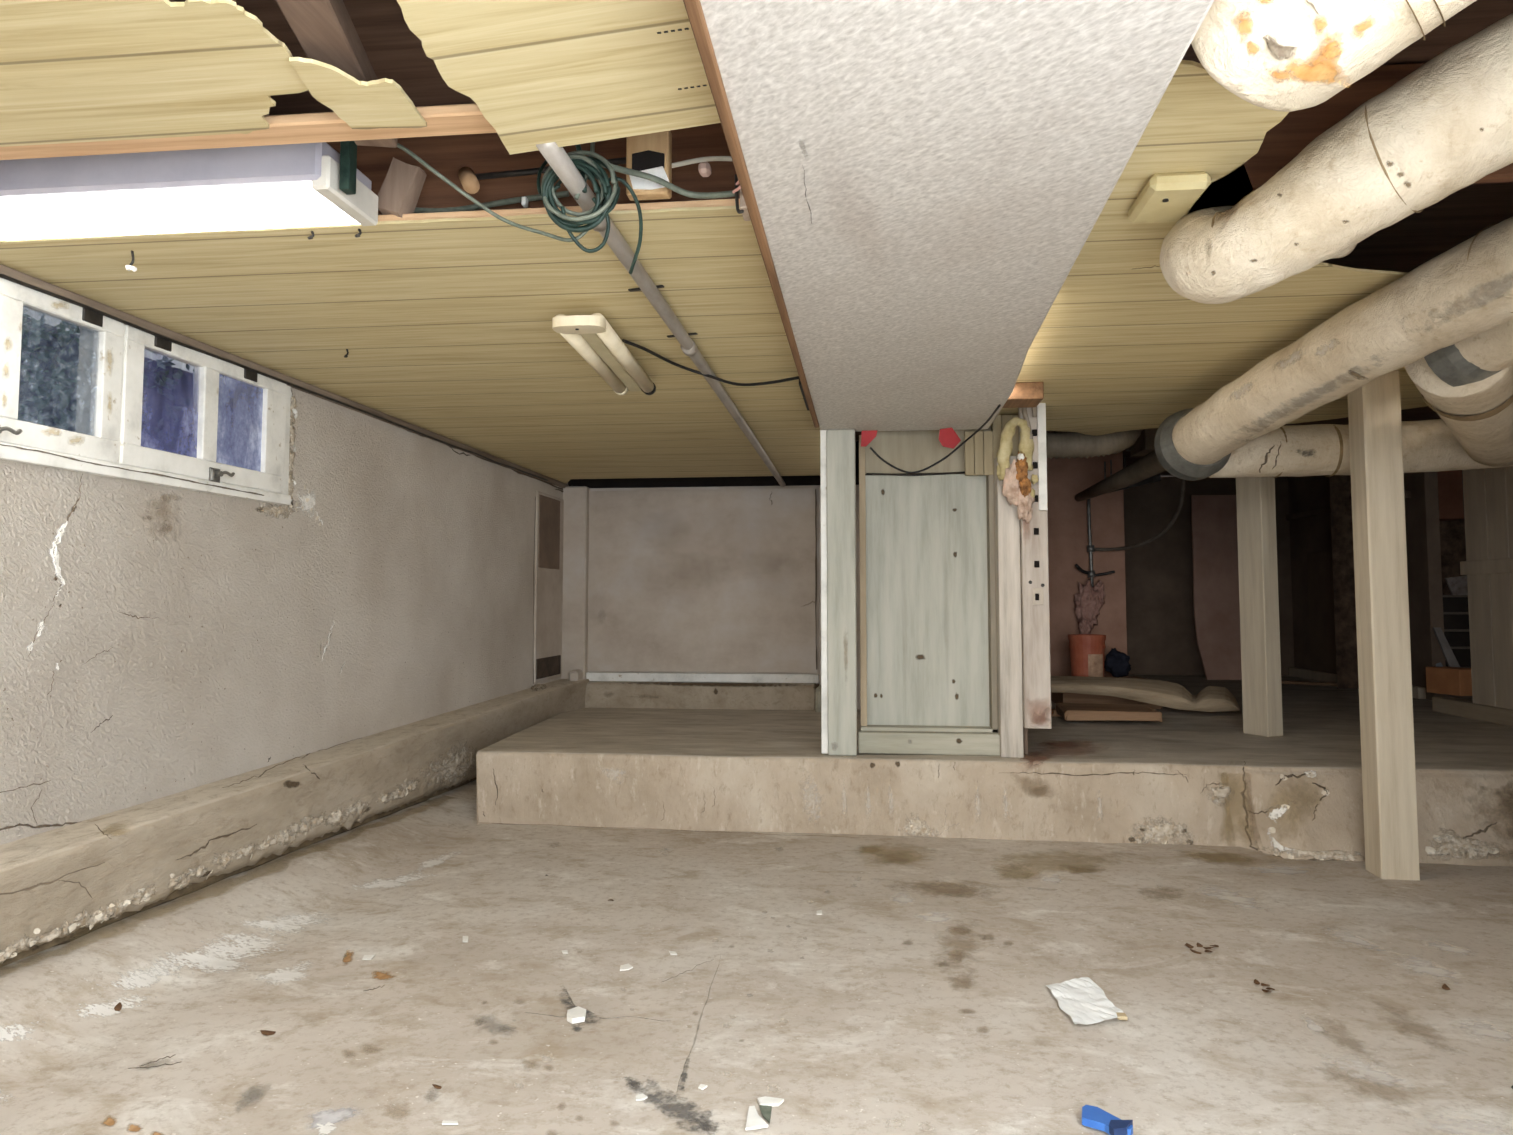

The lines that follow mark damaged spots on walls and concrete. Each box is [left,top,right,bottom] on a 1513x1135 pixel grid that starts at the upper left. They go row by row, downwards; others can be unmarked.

rust [1236,0,1270,54]
rust [1271,18,1341,84]
rust [1356,18,1372,36]
crack [27,474,158,694]
crack [223,738,360,788]
crack [0,780,78,831]
peeling [1276,770,1330,821]
crack [177,824,257,860]
spalling [0,745,476,963]
spalling [1266,804,1360,861]
crack [0,862,105,898]